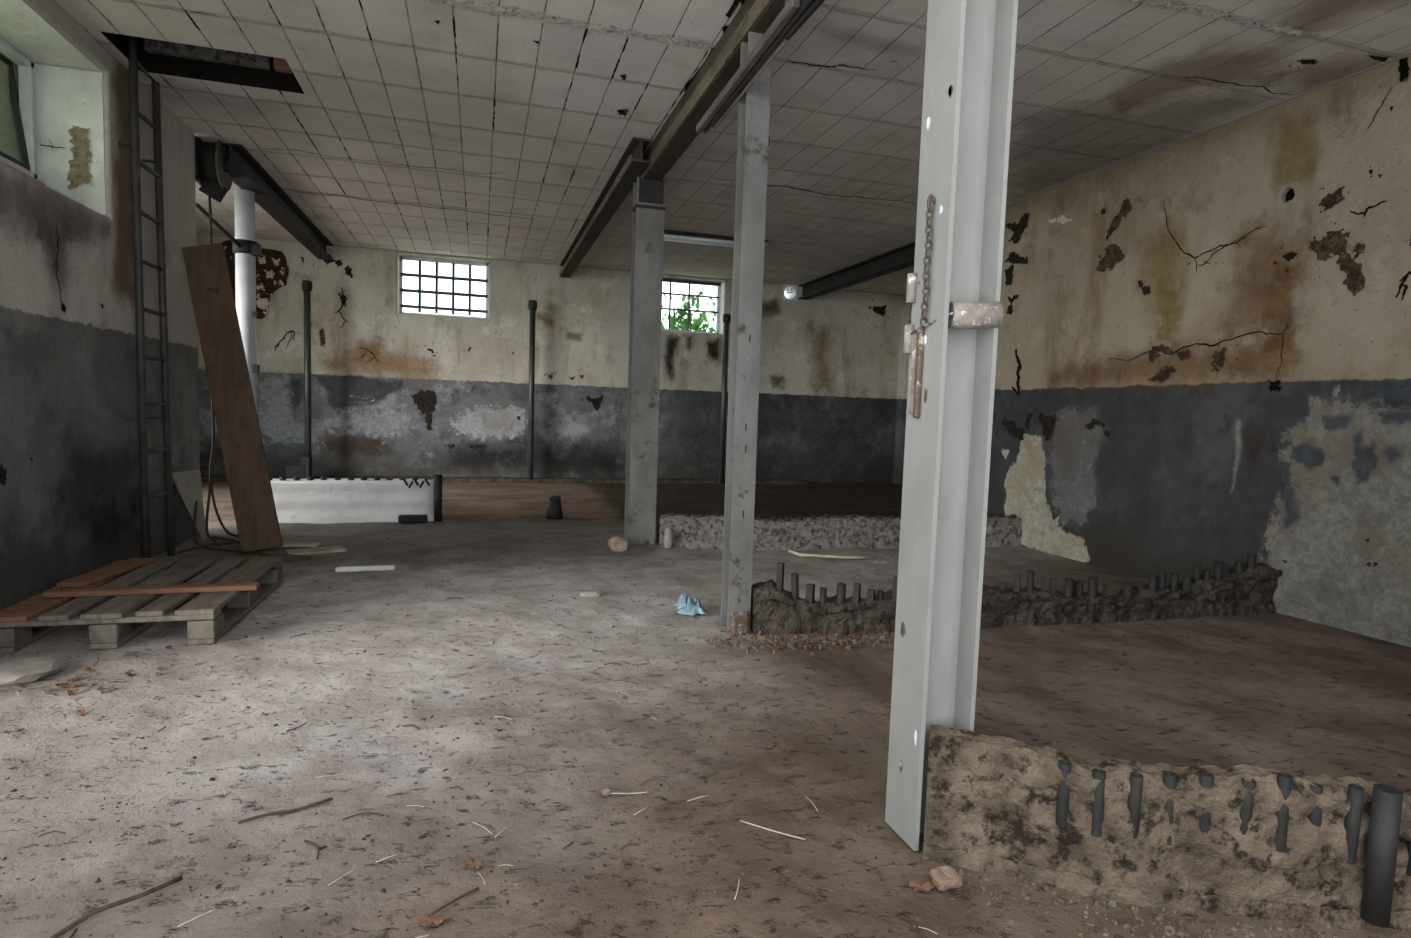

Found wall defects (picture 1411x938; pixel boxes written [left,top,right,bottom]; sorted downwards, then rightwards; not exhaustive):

crack [685,0,745,92]
spalling [67,125,93,189]
spalling [209,240,236,305]
spalling [256,248,353,319]
spalling [1004,203,1034,315]
crack [1163,200,1267,271]
spalling [1273,186,1387,296]
crack [1395,239,1411,300]
crack [1108,324,1288,377]
peeling [257,373,528,456]
peeling [1001,403,1110,563]
peeling [1258,385,1411,647]